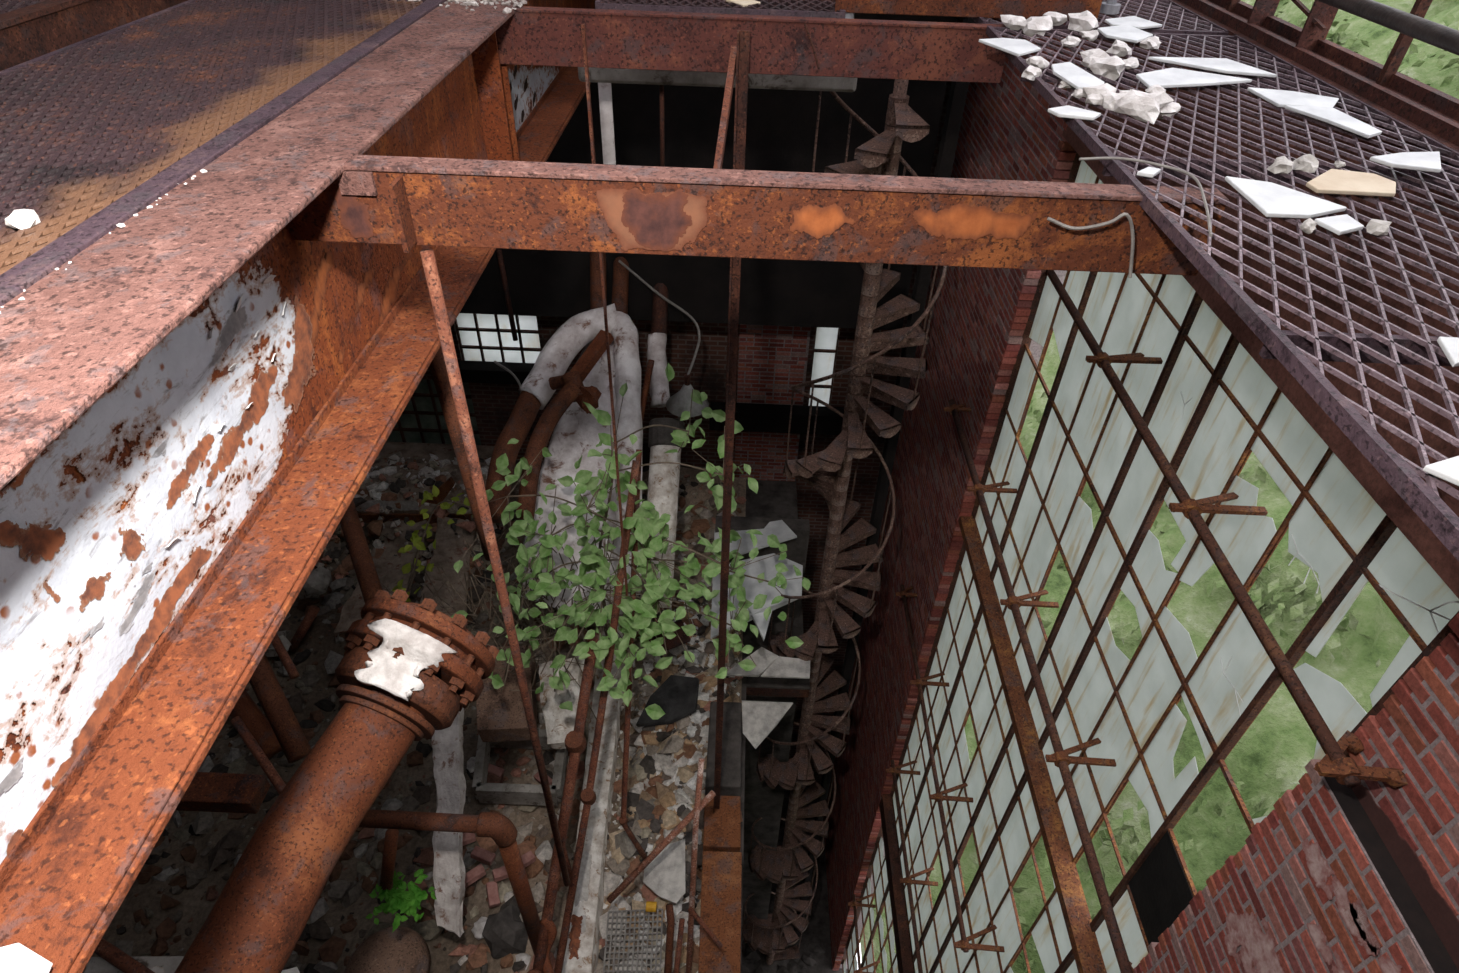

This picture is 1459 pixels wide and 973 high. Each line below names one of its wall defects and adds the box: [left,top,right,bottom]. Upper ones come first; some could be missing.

corrosion [596,188,708,252]
corrosion [790,203,855,239]
corrosion [913,204,1037,241]
corrosion [166,251,333,510]
corrosion [0,459,35,498]
corrosion [358,513,472,524]
corrosion [0,520,67,562]
peeling [0,260,296,864]
corrosion [43,582,61,603]